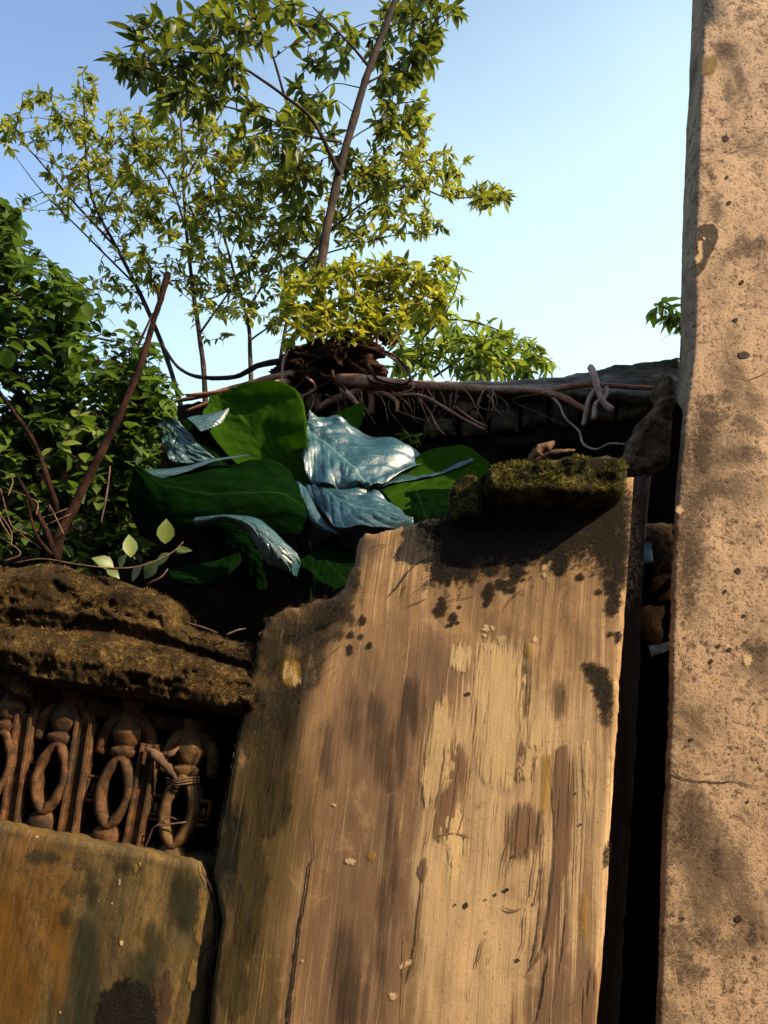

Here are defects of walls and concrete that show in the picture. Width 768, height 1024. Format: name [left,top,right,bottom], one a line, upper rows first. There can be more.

damp [411,486,642,627]
damp [675,388,767,628]
damp [582,662,614,728]
crack [672,770,760,791]
damp [661,787,726,985]